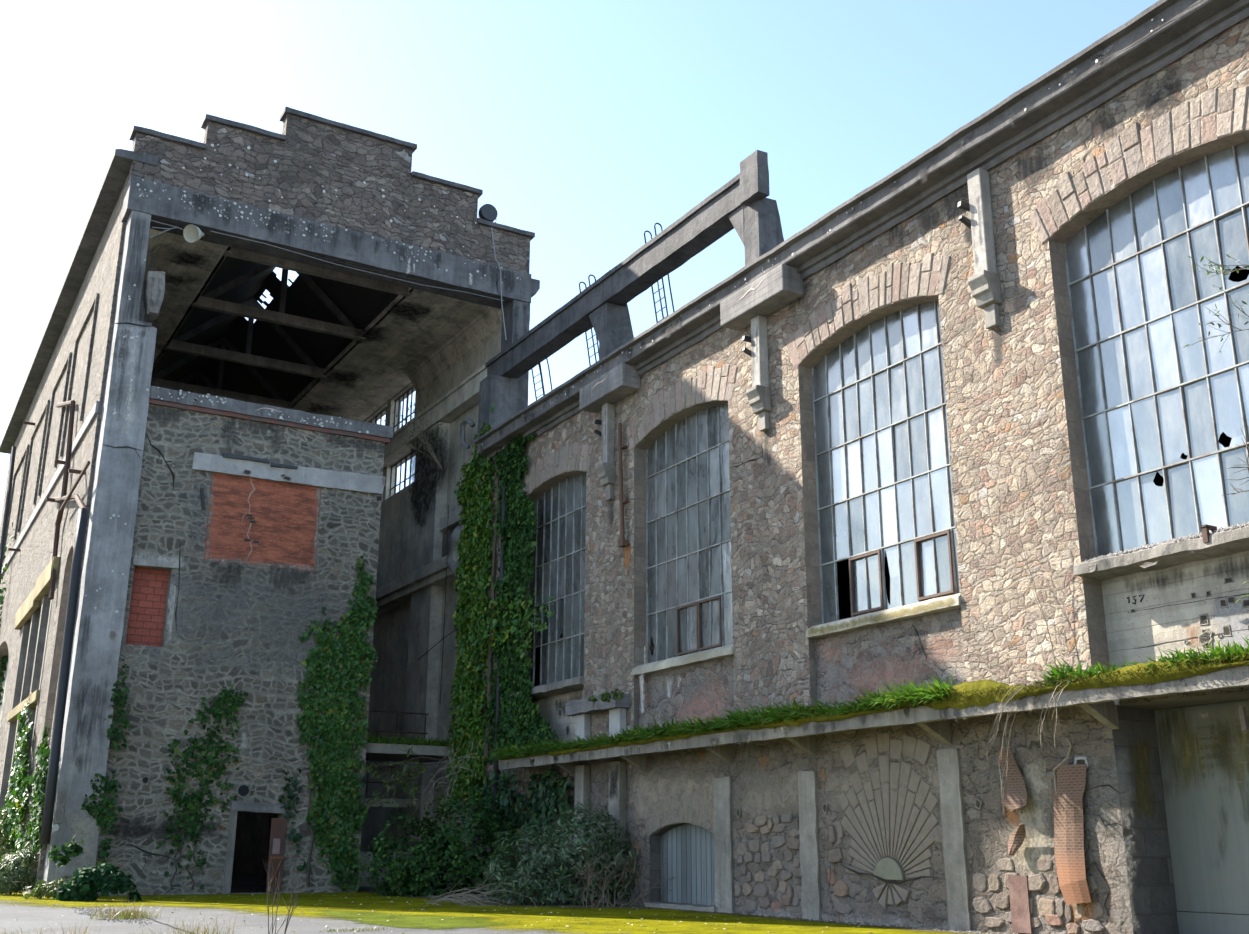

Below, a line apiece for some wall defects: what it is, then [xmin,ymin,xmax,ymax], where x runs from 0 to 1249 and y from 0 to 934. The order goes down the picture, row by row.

crack [103,435,176,489]
crack [242,478,256,564]
corrosion [996,749,1028,856]
corrosion [1053,764,1092,921]